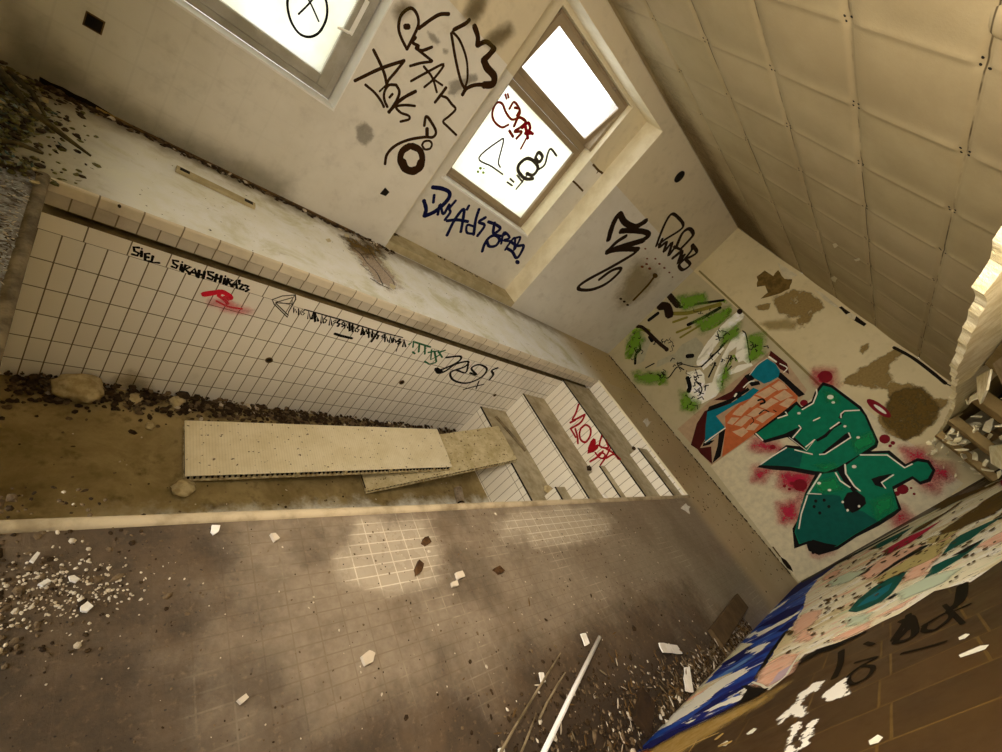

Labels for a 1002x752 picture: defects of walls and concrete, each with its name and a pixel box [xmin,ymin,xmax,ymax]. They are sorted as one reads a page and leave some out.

peeling [757,263,866,326]